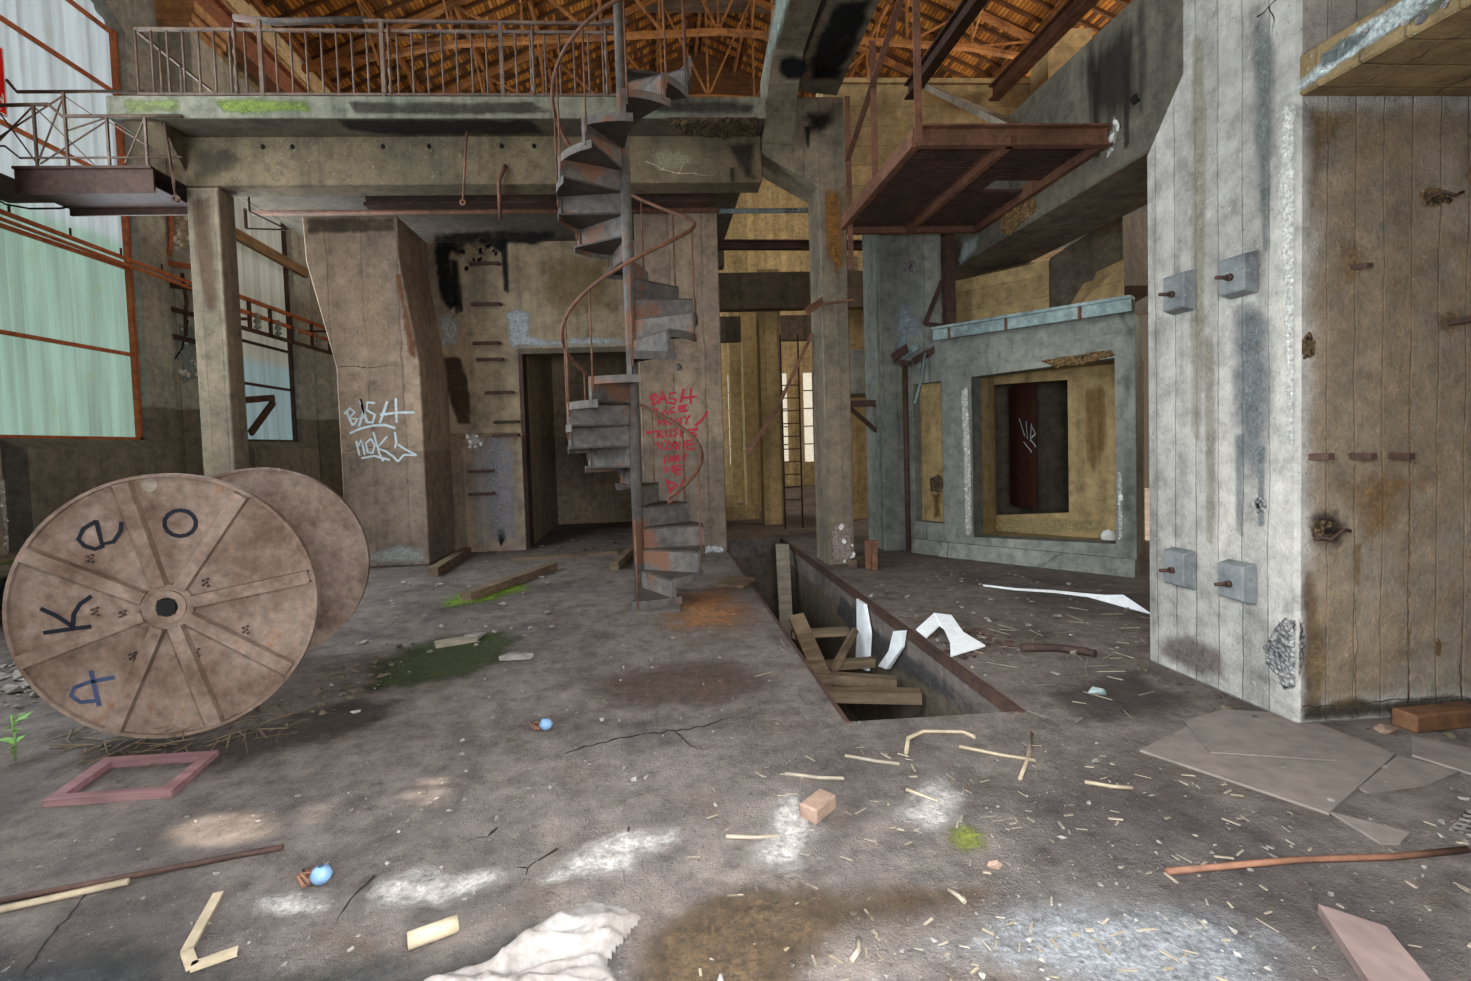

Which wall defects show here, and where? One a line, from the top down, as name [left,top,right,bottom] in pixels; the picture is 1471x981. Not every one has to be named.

peeling [1319,27,1371,70]
peeling [1400,0,1450,26]
leakage [1257,31,1272,220]
leakage [434,230,555,423]
leakage [507,311,621,346]
leakage [1238,312,1265,524]
spalling [1263,618,1306,690]